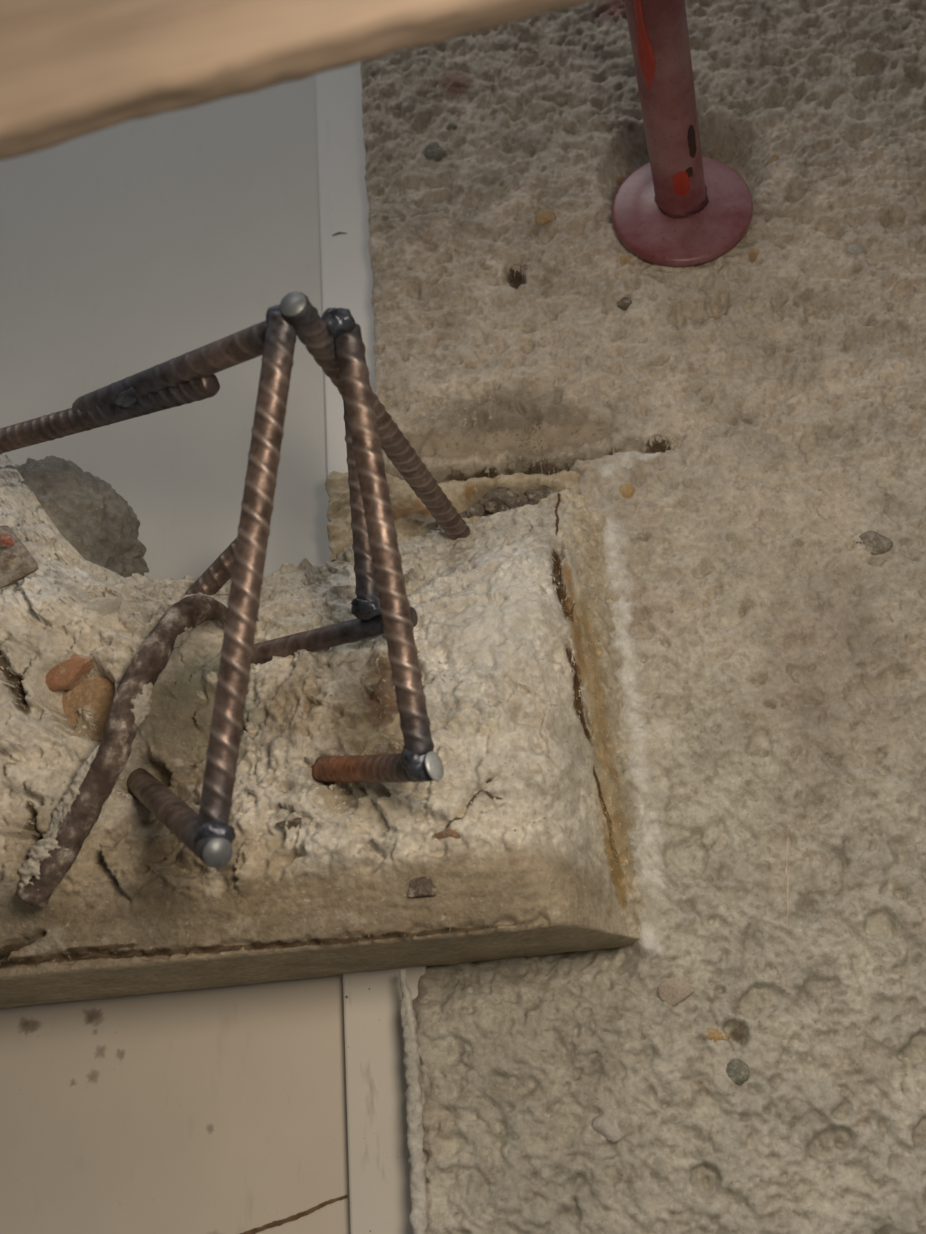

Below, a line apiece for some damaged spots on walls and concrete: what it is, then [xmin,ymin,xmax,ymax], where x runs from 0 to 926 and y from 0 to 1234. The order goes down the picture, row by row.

hole [503,265,526,299]
crack [645,437,670,453]
spalling [0,526,39,589]
crack [446,462,619,863]
spalling [196,671,217,701]
rust [16,595,227,908]
spalling [343,709,404,755]
spalling [275,782,423,835]
spalling [432,802,472,839]
spalling [408,876,438,898]
crack [0,926,498,968]
crack [241,1195,348,1234]